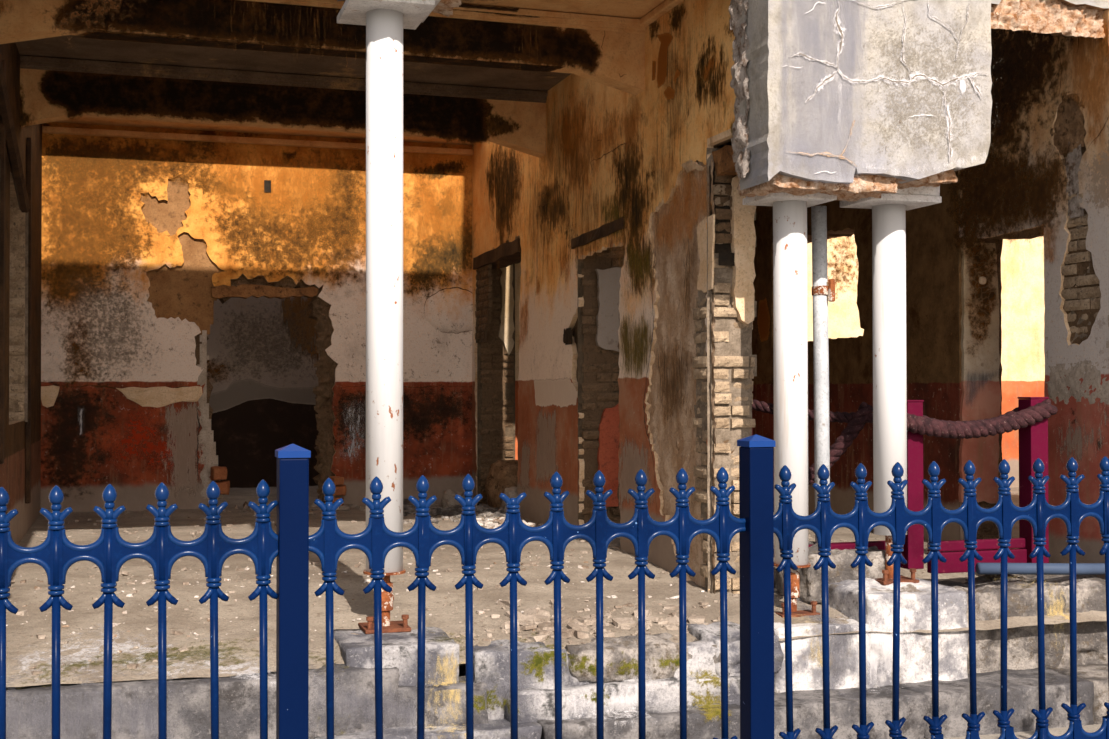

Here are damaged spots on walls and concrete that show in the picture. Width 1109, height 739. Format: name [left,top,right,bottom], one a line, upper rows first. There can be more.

water stain [486,144,522,244]
water stain [536,103,707,321]
crack [787,120,857,174]
crack [782,0,988,162]
spalling [991,0,1105,44]
flaking render [1050,91,1109,344]
water stain [41,134,366,497]
flaking render [116,176,334,501]
water stain [403,386,472,443]
water stain [658,343,692,421]
flaking render [618,159,735,520]
flaking render [687,534,716,594]